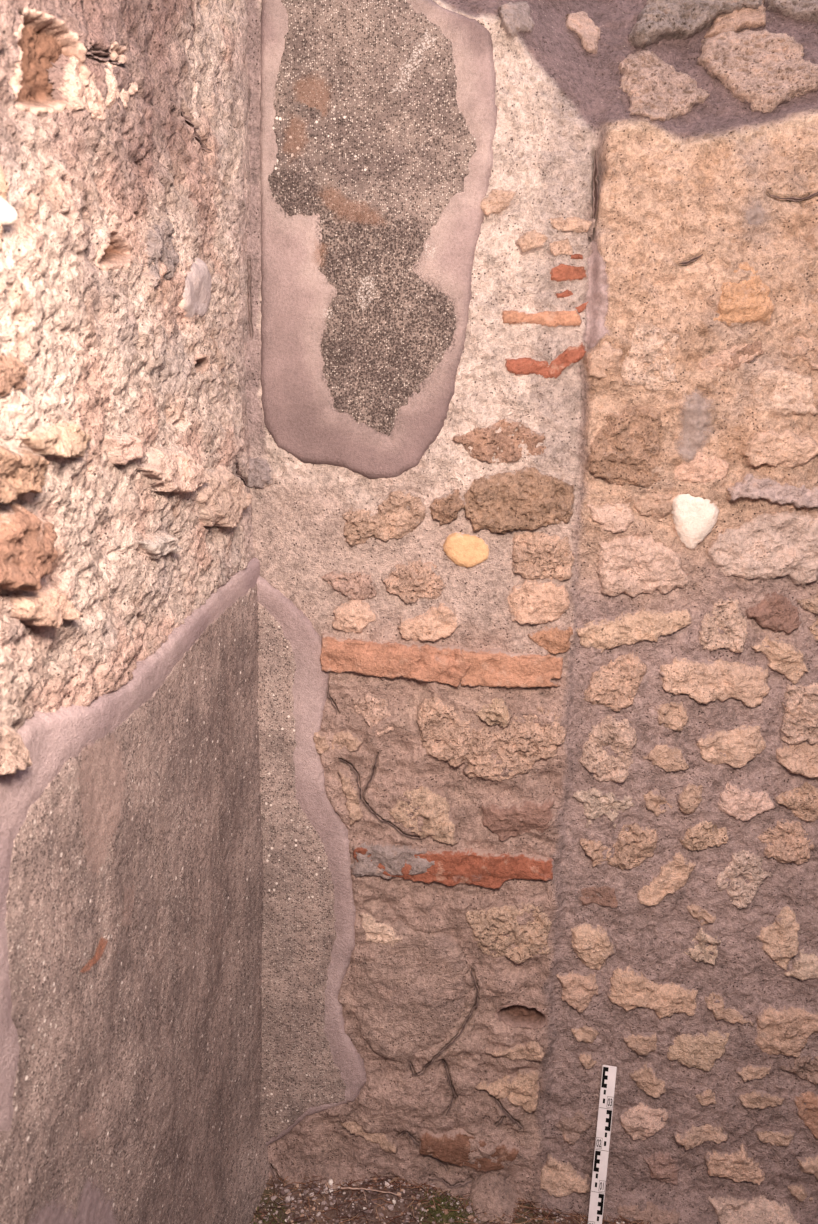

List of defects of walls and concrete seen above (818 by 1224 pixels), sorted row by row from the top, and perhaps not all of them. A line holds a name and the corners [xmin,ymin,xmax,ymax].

crack [339,754,420,839]
crack [409,970,479,1115]
crack [494,1097,522,1128]